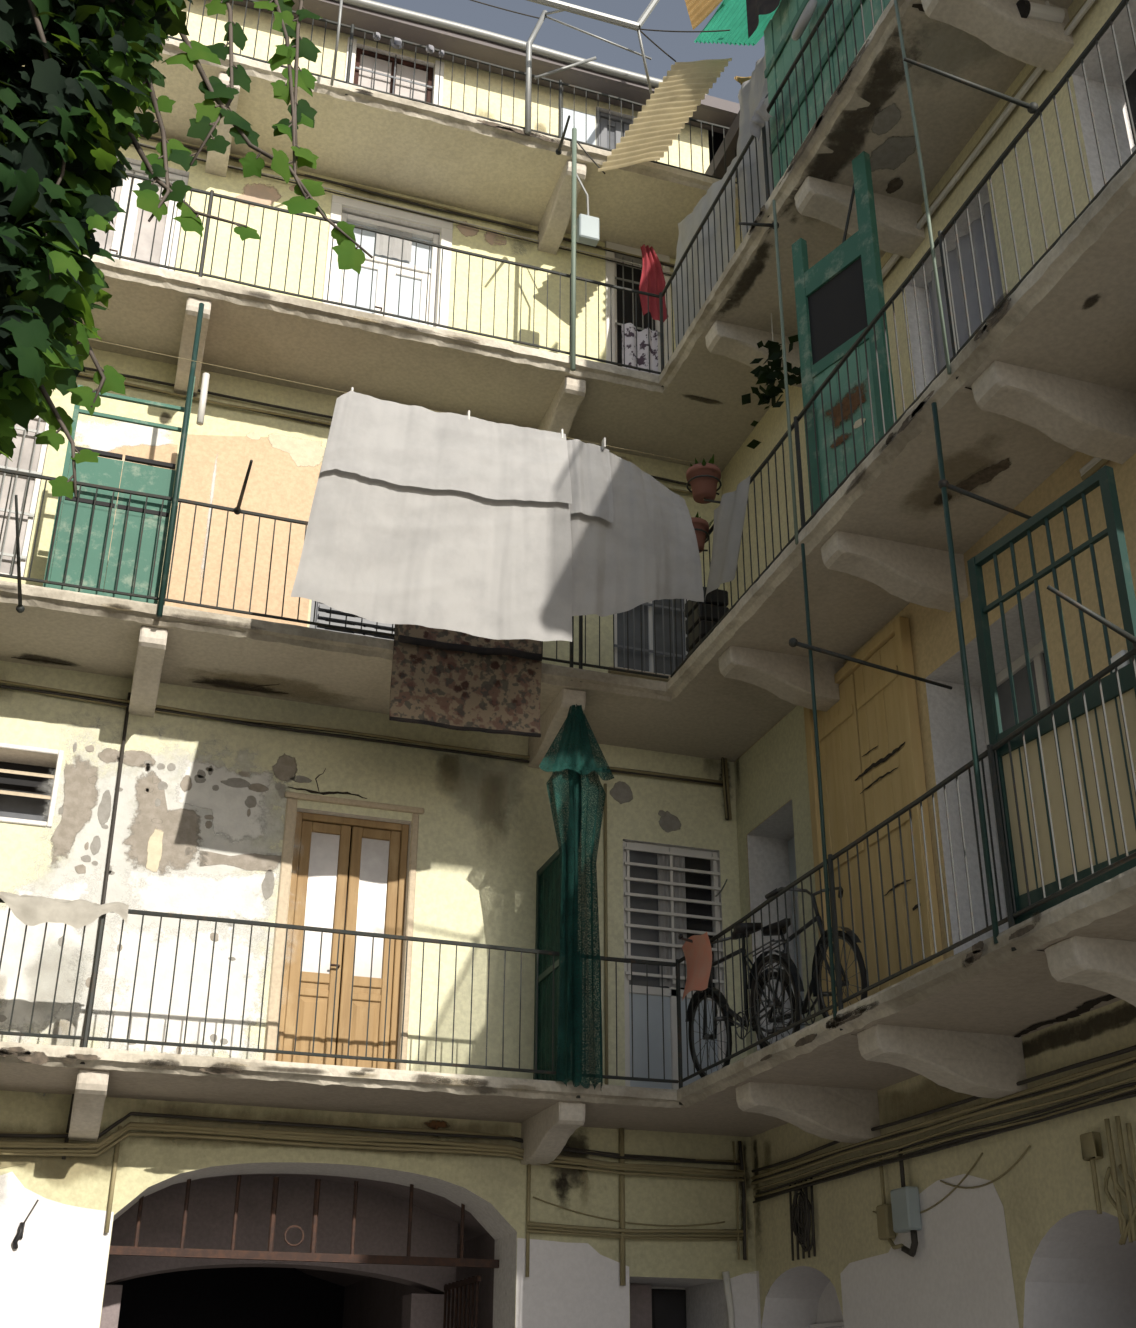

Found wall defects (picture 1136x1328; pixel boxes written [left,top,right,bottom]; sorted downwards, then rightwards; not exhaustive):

damp [785,33,905,211]
damp [720,227,772,313]
peeling [74,412,173,469]
peeling [246,432,325,467]
damp [934,458,1011,505]
peeling [201,461,217,569]
crack [289,768,367,799]
peeling [0,733,324,1074]
damp [1014,994,1136,1058]
damp [553,1136,588,1202]